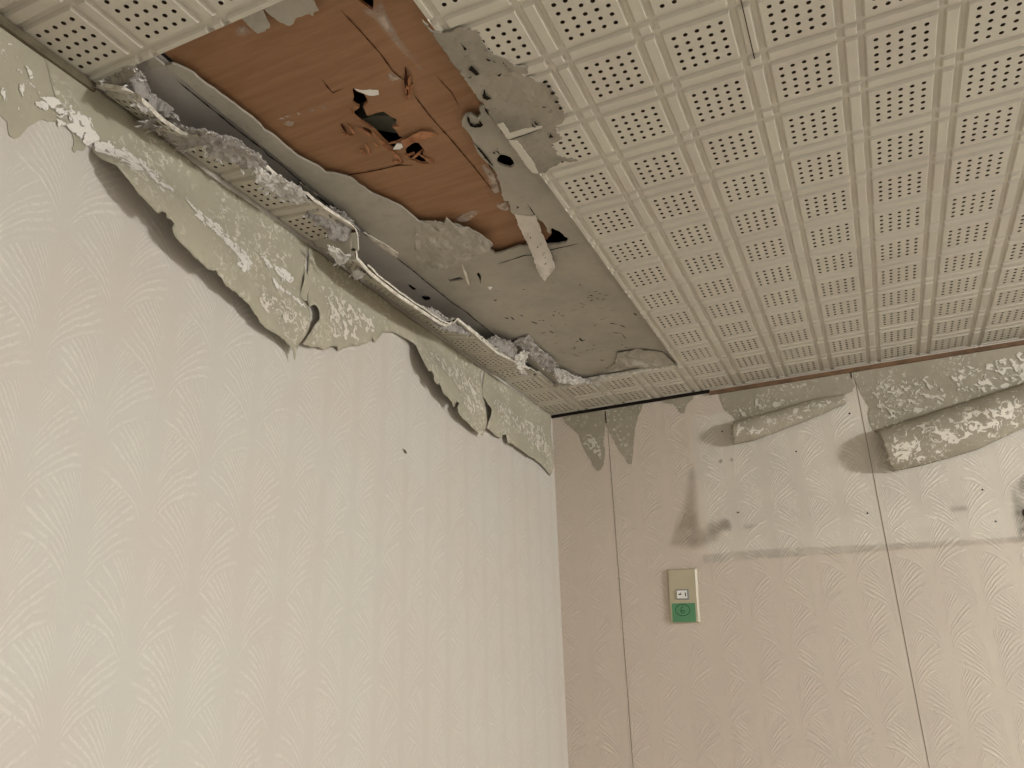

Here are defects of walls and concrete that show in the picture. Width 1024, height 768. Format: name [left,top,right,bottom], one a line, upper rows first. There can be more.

peeling [422,19,578,174]
peeling [363,262,450,324]
peeling [719,345,1024,434]
peeling [562,404,643,471]